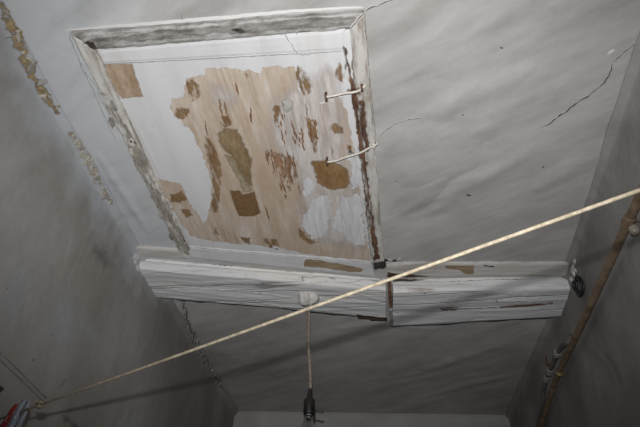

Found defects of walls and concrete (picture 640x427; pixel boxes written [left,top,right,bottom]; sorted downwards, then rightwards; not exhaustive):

flaking render [0,2,60,114]
crack [533,43,635,130]
peeling [157,66,402,272]
rust [343,47,380,260]
peeling [445,265,474,274]